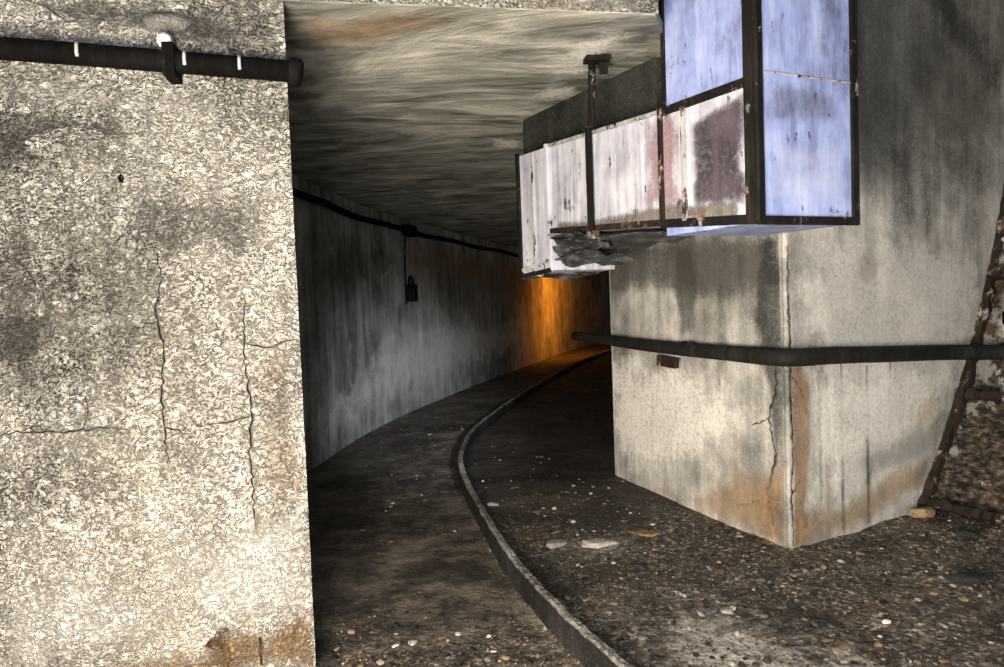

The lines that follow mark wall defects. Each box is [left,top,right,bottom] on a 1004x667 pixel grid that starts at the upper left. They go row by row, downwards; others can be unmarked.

damp [0,118,62,163]
crack [0,397,131,436]
crack [134,252,295,535]
crack [736,245,807,546]
corrosion [148,620,310,667]